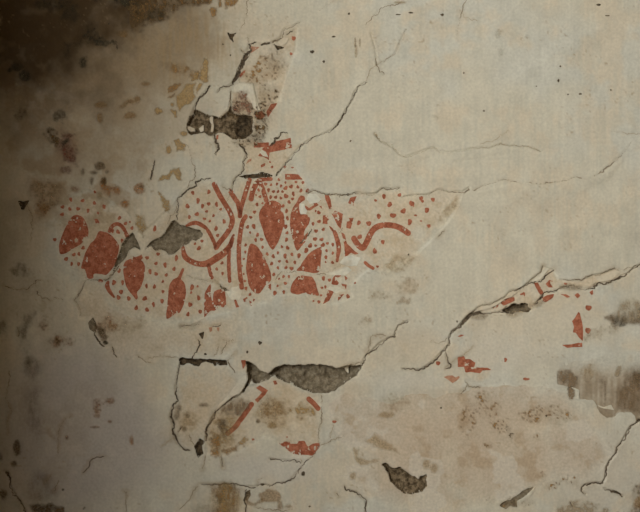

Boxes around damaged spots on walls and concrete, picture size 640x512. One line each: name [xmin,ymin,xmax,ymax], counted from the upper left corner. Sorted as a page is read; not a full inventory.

damp [114,0,238,28]
damp [168,59,208,117]
crack [276,29,407,176]
damp [160,168,181,180]
peeling [57,29,462,457]
crack [405,264,640,371]
peeling [467,266,626,321]
crack [138,324,248,468]
crack [180,395,342,512]
peeling [329,351,640,512]
damp [559,371,577,399]
crack [570,419,640,507]